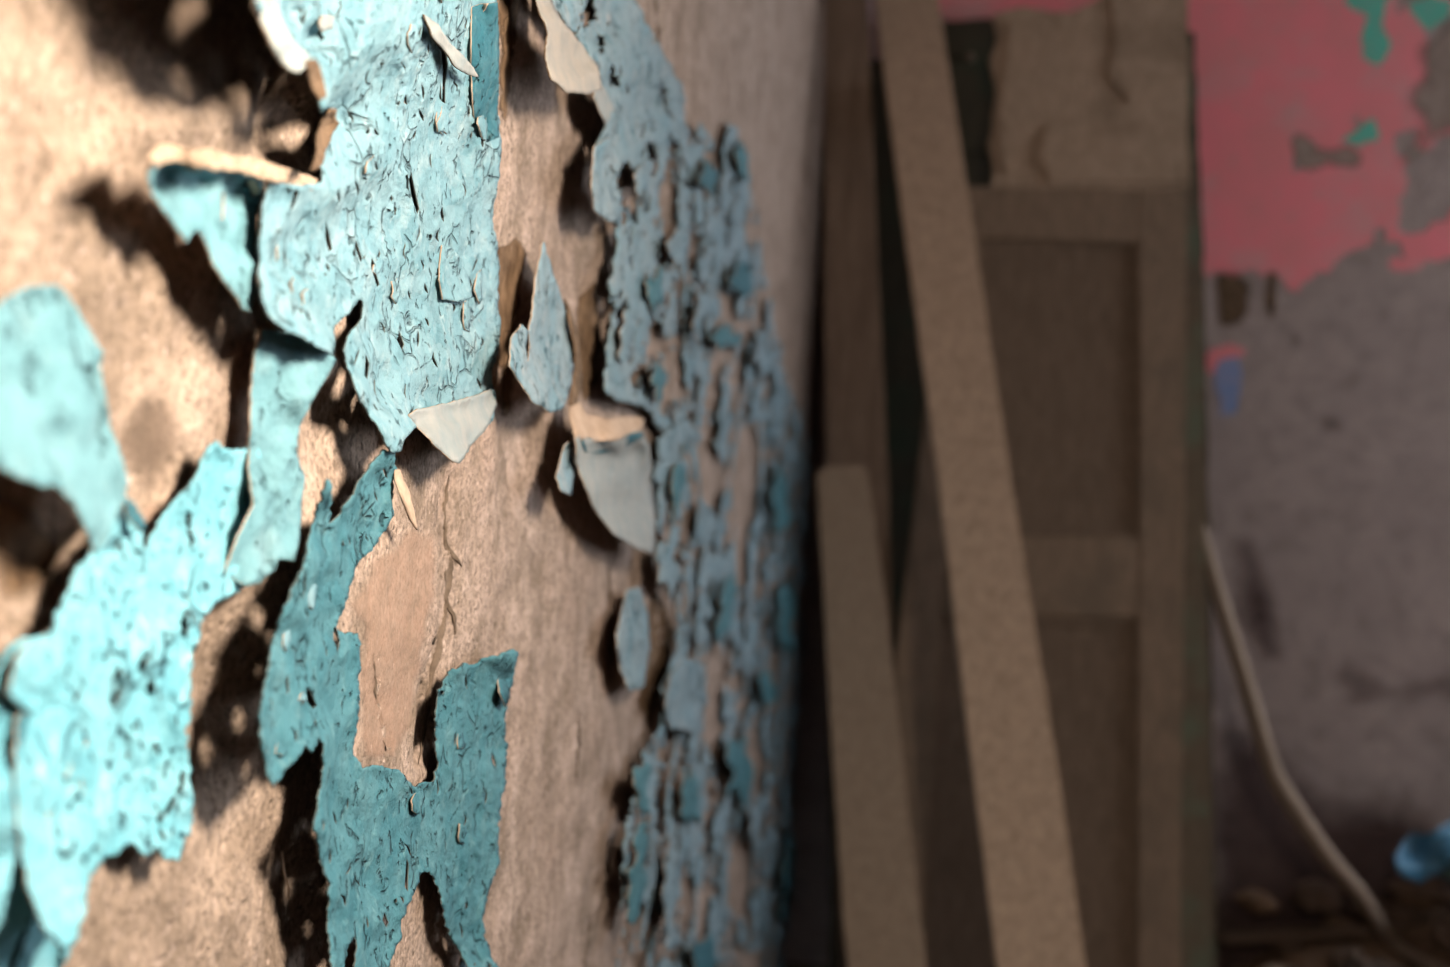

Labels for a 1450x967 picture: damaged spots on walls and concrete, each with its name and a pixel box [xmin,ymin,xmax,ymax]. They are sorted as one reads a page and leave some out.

peeling [939,0,1096,21]
peeling [1188,0,1450,326]
peeling [0,0,810,967]
crack [373,478,462,764]